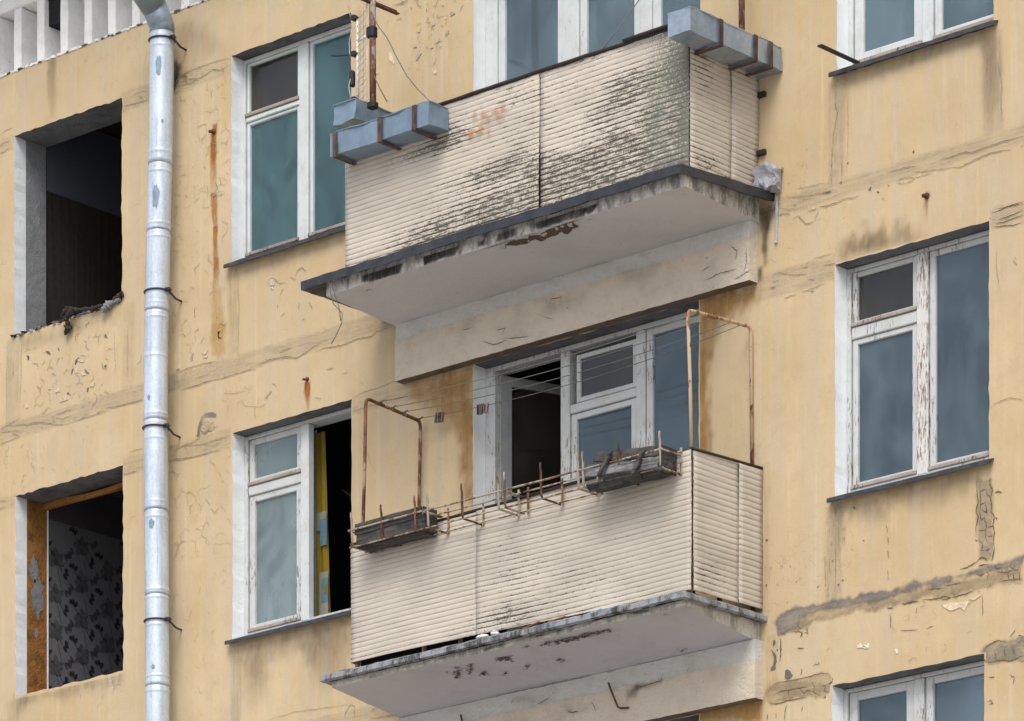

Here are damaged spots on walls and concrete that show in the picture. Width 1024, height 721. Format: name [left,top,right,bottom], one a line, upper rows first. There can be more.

crack [781,91,856,225]
crack [882,136,1022,199]
damp [536,204,597,228]
crack [993,202,1023,227]
peeling [506,222,579,246]
damp [423,246,458,265]
peeling [942,596,980,611]